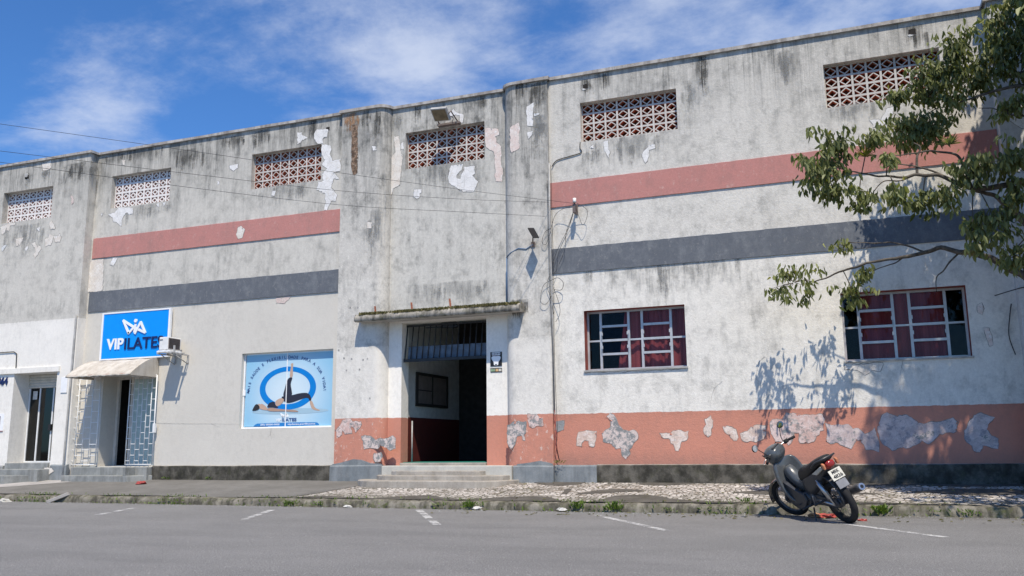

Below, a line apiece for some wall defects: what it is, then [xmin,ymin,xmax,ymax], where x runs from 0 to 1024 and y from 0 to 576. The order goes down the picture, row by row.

peeling [485,102,540,182]
peeling [297,124,358,210]
peeling [448,164,479,192]
peeling [101,207,133,226]
peeling [335,419,396,463]
peeling [507,413,565,450]
peeling [576,413,639,459]
peeling [660,430,689,451]
peeling [703,412,999,453]